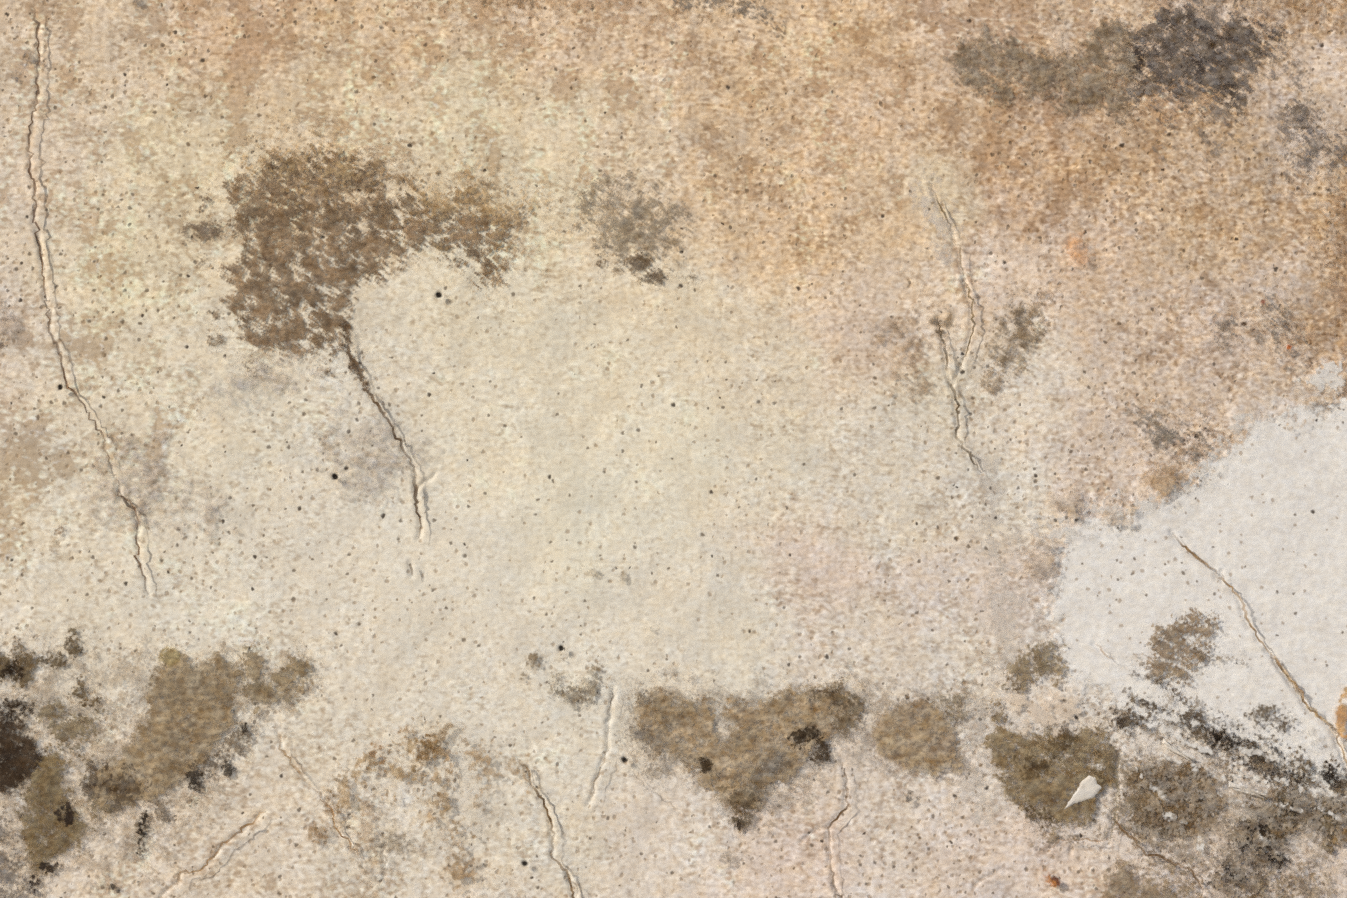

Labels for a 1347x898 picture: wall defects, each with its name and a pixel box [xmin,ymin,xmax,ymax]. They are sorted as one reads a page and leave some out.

damp [943,0,1347,190]
crack [27,14,146,587]
damp [182,130,549,403]
crack [346,337,422,532]
damp [0,628,314,898]
crack [521,764,575,898]
damp [520,653,601,709]
crack [827,768,849,837]
damp [614,457,1347,898]
crack [1179,541,1347,764]
corrosion [1335,687,1347,738]